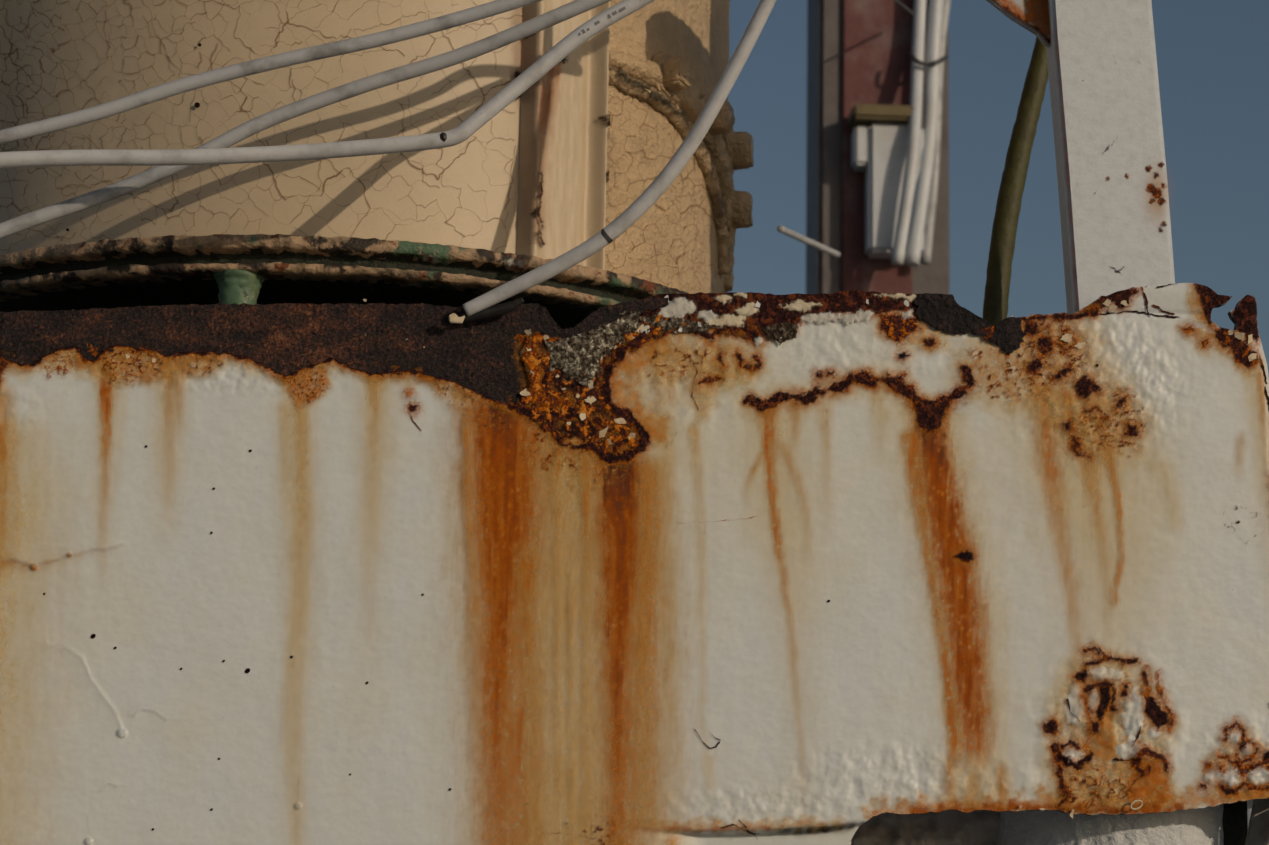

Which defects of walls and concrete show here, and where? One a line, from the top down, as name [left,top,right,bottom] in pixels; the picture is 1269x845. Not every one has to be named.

rust [994,0,1051,43]
crack [0,0,515,252]
crack [606,97,711,290]
rust [0,394,19,583]
rust [100,355,113,455]
rust [279,366,329,408]
peeling [0,290,918,411]
rust [394,308,710,845]
rust [878,311,943,361]
rust [967,305,1145,601]
rust [866,401,1269,819]
rust [1180,295,1263,401]